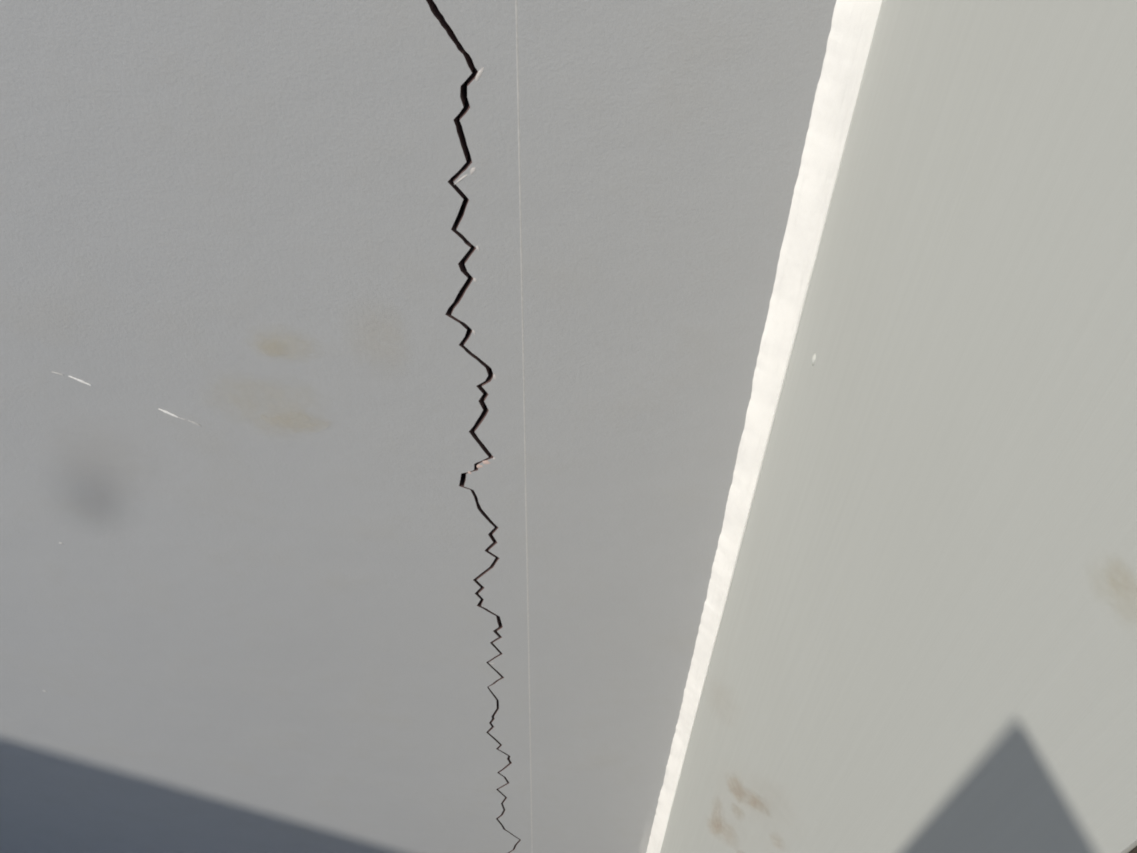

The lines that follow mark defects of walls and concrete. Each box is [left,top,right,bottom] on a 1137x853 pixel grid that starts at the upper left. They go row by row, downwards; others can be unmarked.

crack [426,0,521,853]